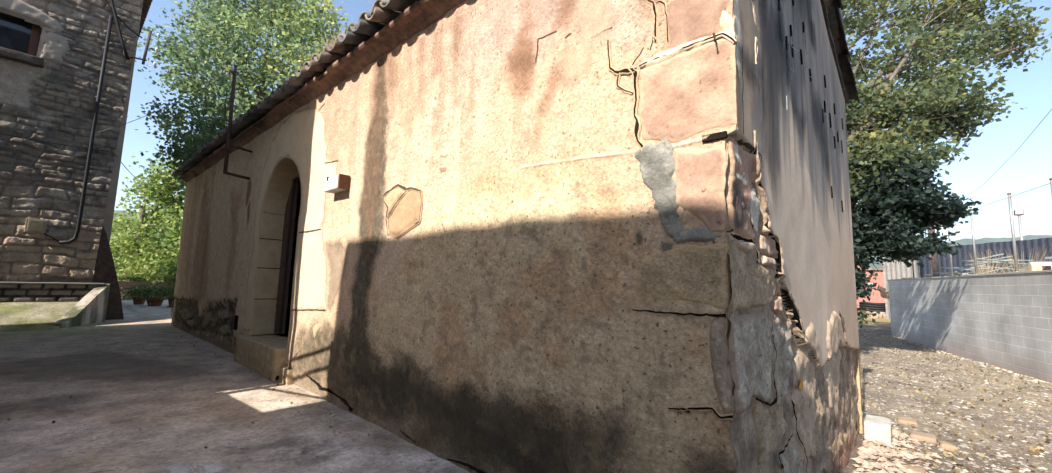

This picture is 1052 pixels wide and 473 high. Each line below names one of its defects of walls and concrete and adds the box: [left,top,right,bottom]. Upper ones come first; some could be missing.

spalling [171,296,237,344]
spalling [383,183,423,239]
water stain [291,60,630,473]
crack [535,0,849,473]
spalling [723,131,864,473]